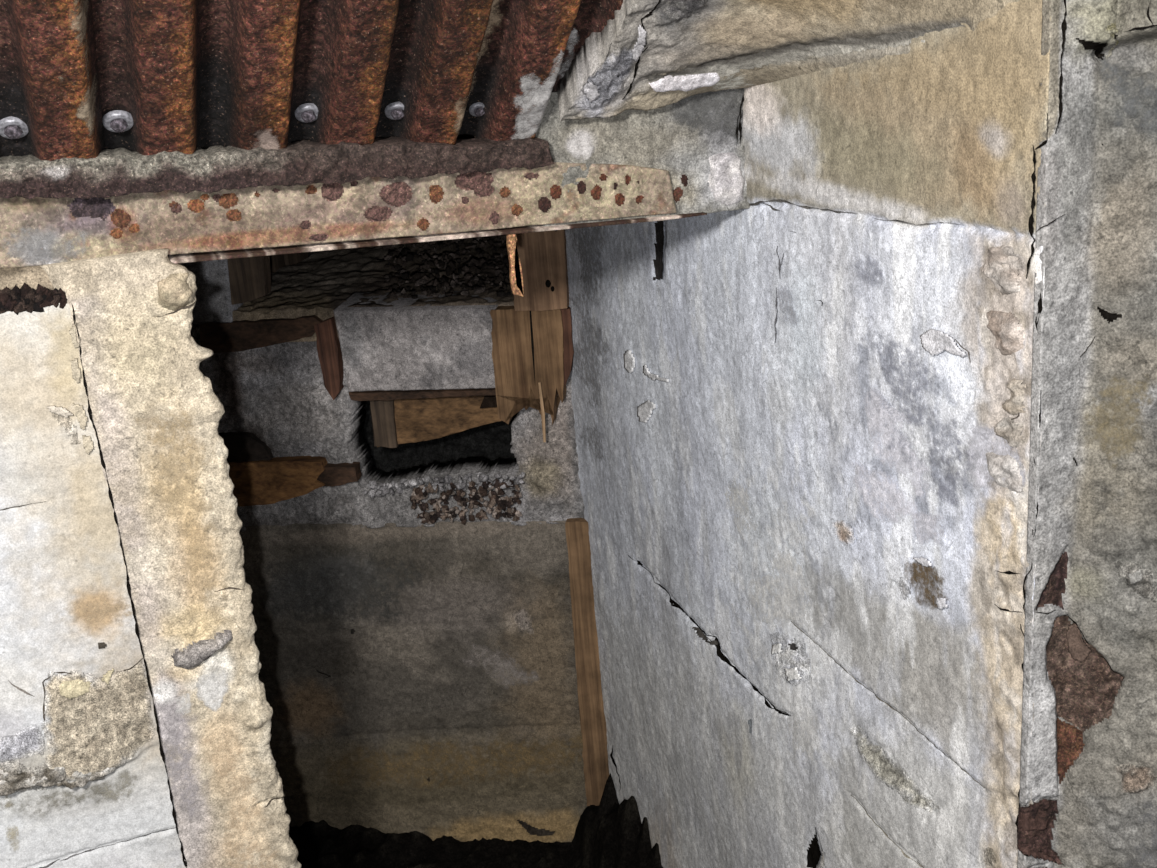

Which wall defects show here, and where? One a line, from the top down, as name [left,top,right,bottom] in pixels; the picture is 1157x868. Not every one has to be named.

crack [606,0,661,100]
rust [169,193,242,221]
rust [363,182,413,222]
rust [429,171,523,224]
rust [538,184,562,213]
rust [577,173,644,206]
rust [673,174,688,203]
crack [1017,0,1067,330]
crack [39,303,187,868]
crack [628,555,791,716]
crack [994,503,1124,687]
spalling [0,659,155,796]